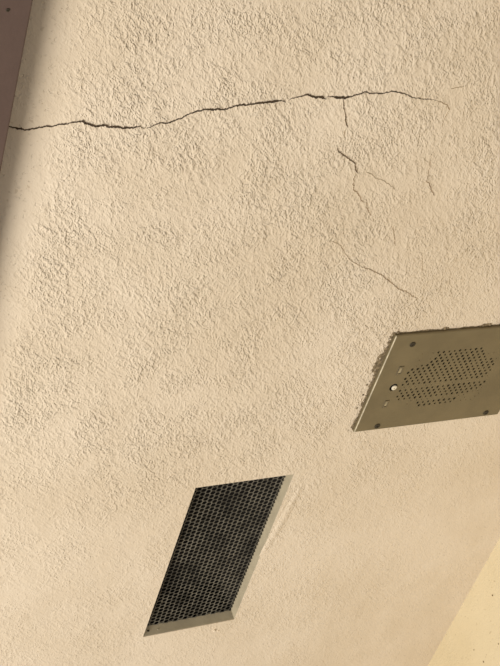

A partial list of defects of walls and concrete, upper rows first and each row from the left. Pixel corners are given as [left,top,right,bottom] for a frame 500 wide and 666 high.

crack [9,86,464,216]